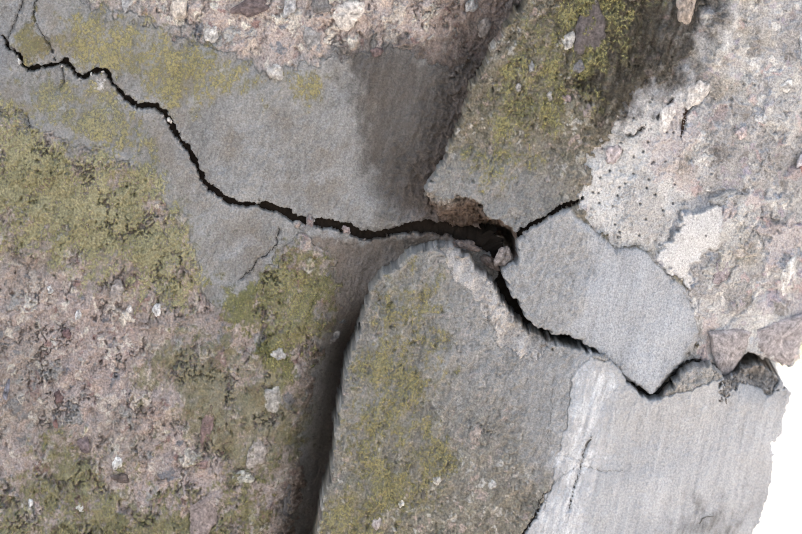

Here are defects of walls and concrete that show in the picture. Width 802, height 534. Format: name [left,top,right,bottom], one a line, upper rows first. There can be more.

crack [629,99,688,137]
crack [2,0,582,337]
spalling [524,0,802,534]
crack [631,360,717,396]
crack [522,435,623,534]